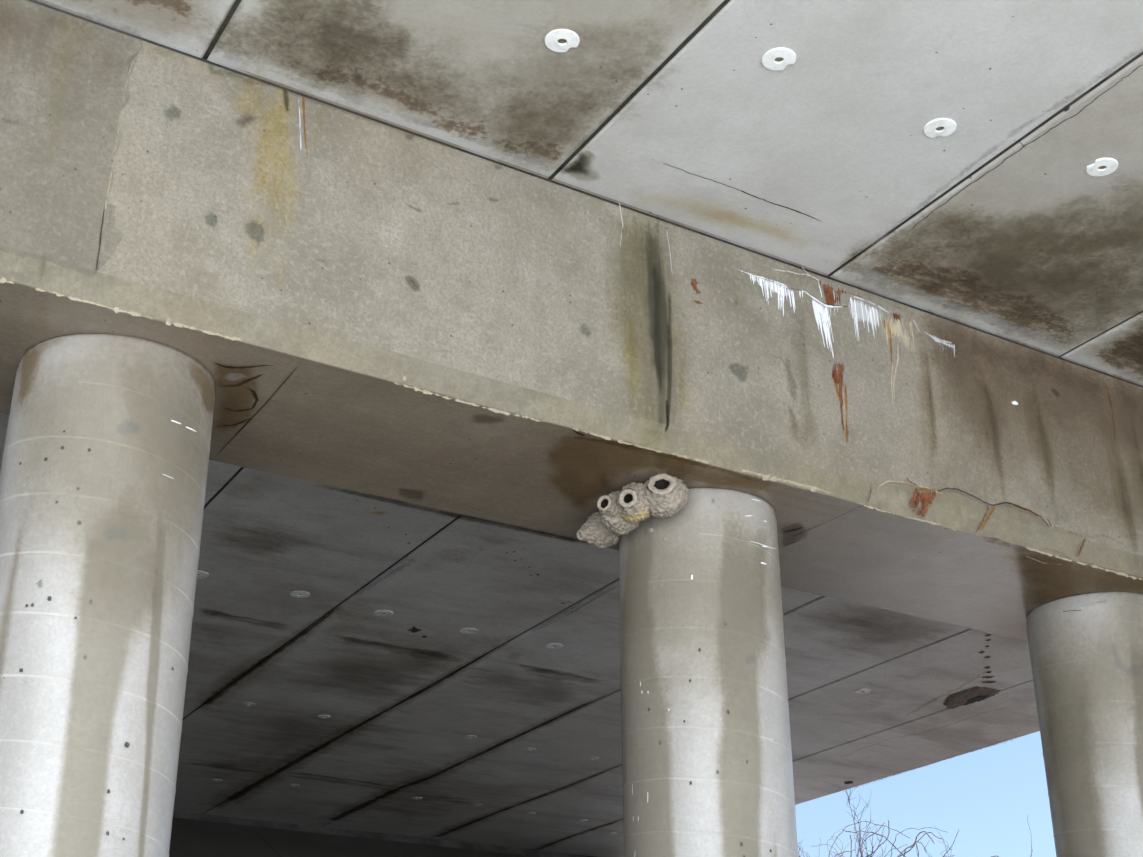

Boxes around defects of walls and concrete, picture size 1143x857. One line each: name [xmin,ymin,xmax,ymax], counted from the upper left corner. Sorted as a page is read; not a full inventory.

spalling [36,288,150,318]
spalling [166,318,242,341]
damp [740,270,955,400]
spalling [395,376,542,422]
corrosion [832,363,844,430]
spalling [573,428,709,464]
spalling [741,469,829,493]
corrosion [907,478,936,518]
spalling [1025,547,1143,580]
spalling [943,687,1001,709]